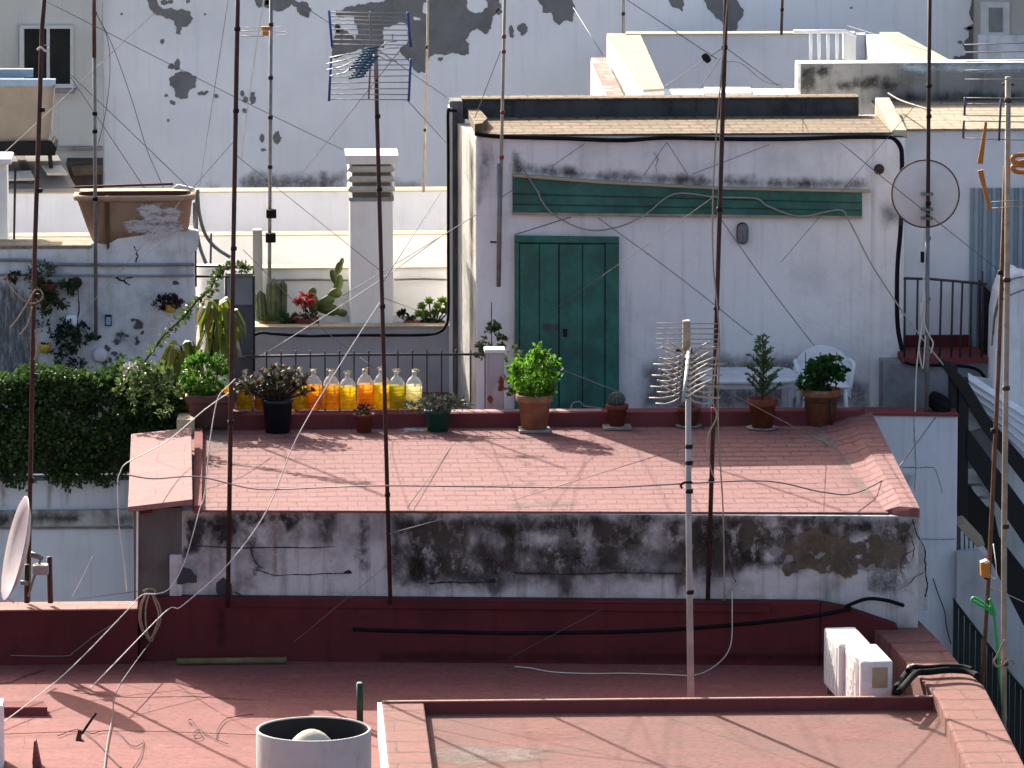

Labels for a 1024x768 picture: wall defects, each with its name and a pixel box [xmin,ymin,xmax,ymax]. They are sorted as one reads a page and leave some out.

peeling [147,0,206,35]
peeling [255,0,312,18]
peeling [331,0,503,73]
peeling [509,23,528,38]
peeling [538,0,575,25]
peeling [704,0,744,31]
peeling [165,57,219,105]
leakage [801,67,827,92]
leakage [838,76,919,101]
leakage [939,93,1015,101]
leakage [391,513,912,593]
peeling [768,529,909,591]